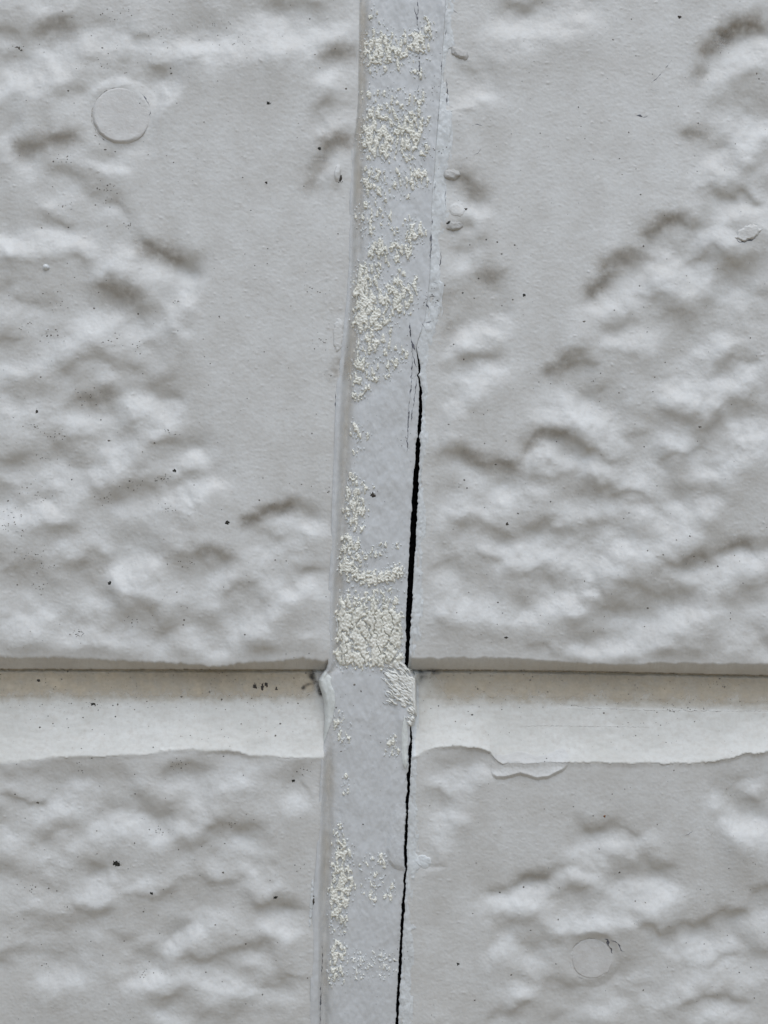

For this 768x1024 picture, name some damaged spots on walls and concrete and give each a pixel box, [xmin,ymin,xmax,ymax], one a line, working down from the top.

crack [405,296,435,668]
crack [395,726,412,1024]